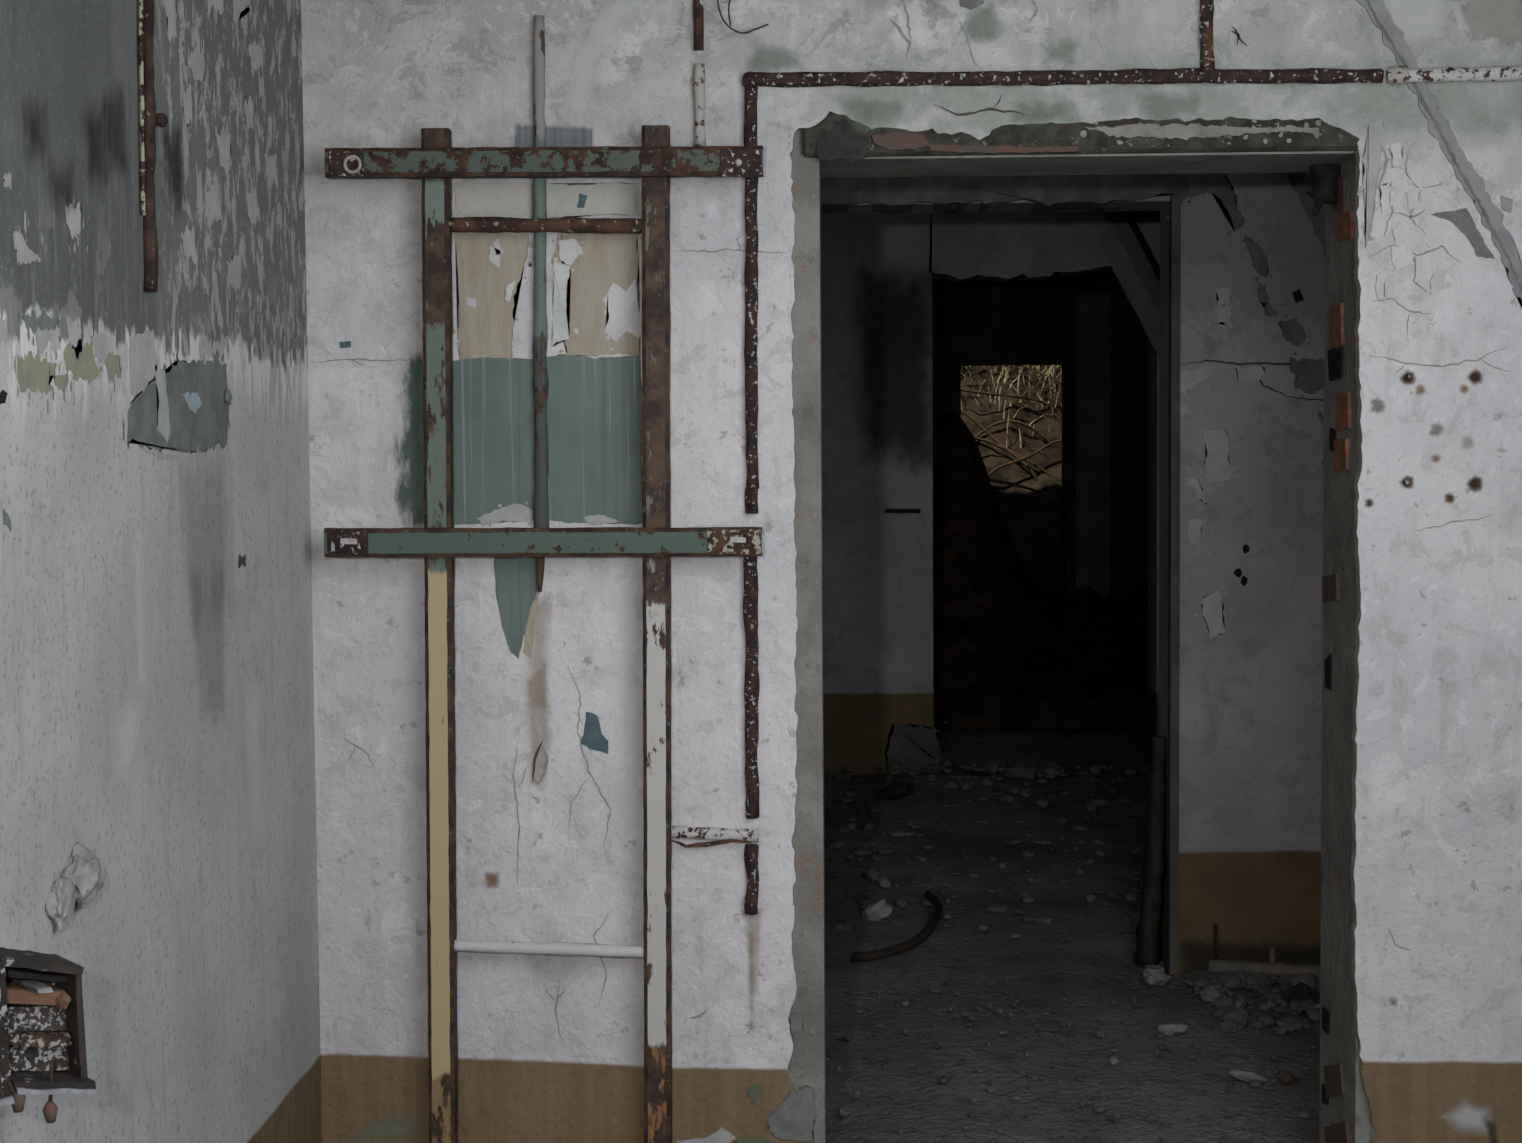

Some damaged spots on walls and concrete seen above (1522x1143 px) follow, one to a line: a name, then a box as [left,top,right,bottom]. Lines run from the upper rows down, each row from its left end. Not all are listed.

spalling [1465,0,1522,45]
peeling [872,118,1324,154]
water stain [165,136,183,200]
peeling [1337,117,1495,259]
peeling [452,178,642,361]
peeling [0,301,232,460]
peeling [477,502,533,526]
peeling [585,514,619,525]
flaking render [1322,573,1339,602]
peeling [581,712,608,754]
spalling [789,1012,807,1038]
spalling [677,1074,816,1143]